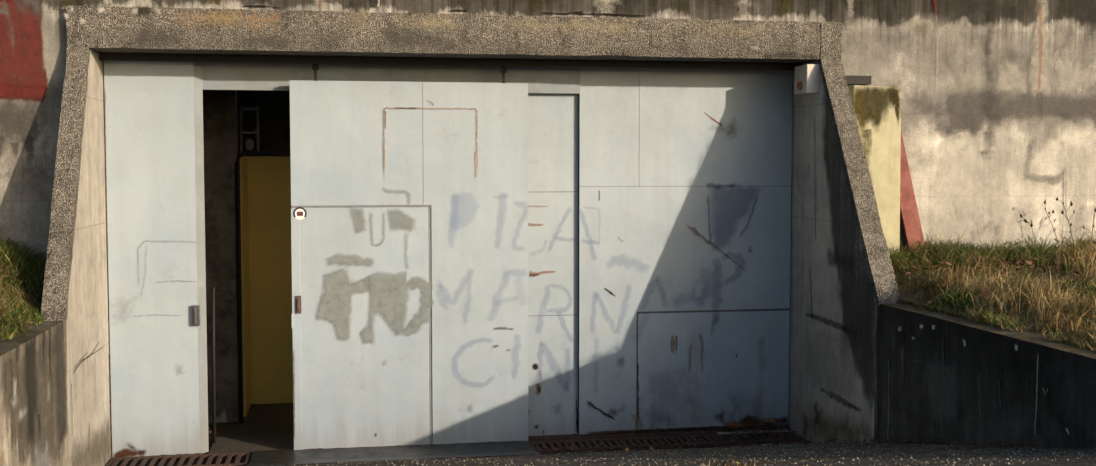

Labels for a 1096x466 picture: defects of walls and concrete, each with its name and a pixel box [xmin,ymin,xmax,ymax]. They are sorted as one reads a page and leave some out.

damp [949,0,1096,150]
damp [0,103,39,153]
rust [591,365,789,435]